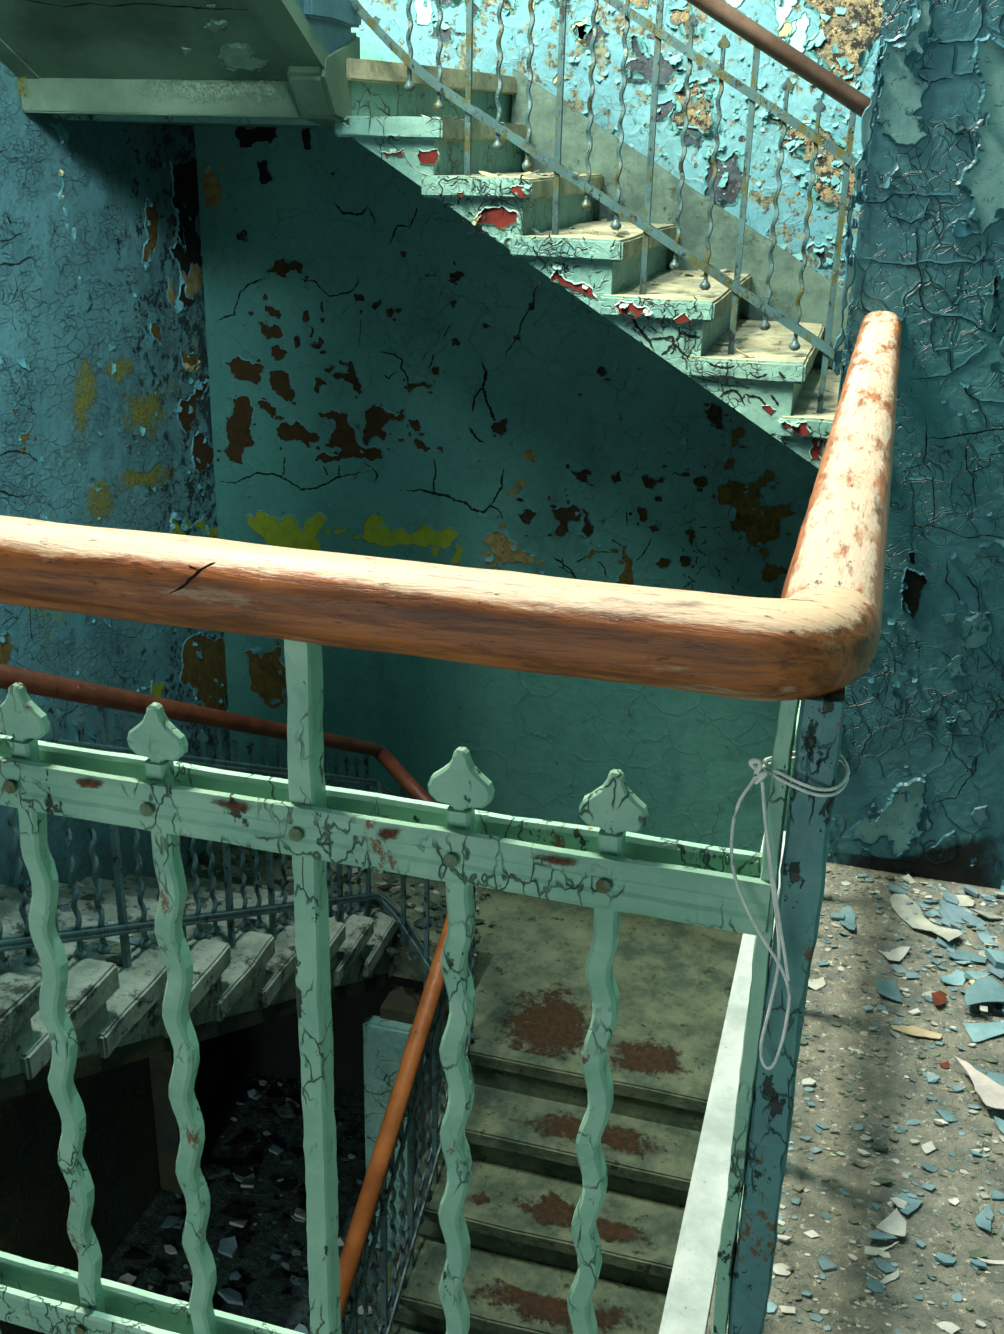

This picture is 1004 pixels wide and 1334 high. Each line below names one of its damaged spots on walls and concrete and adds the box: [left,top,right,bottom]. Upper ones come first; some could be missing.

peeling [625,0,746,209]
peeling [759,0,942,376]
crack [884,0,1004,82]
peeling [949,33,1004,238]
crack [0,233,35,347]
peeling [173,293,444,476]
peeling [244,509,464,564]
crack [220,457,504,518]
crack [335,175,616,442]
crack [623,295,786,406]
crack [856,191,1004,611]
peeling [890,893,994,949]